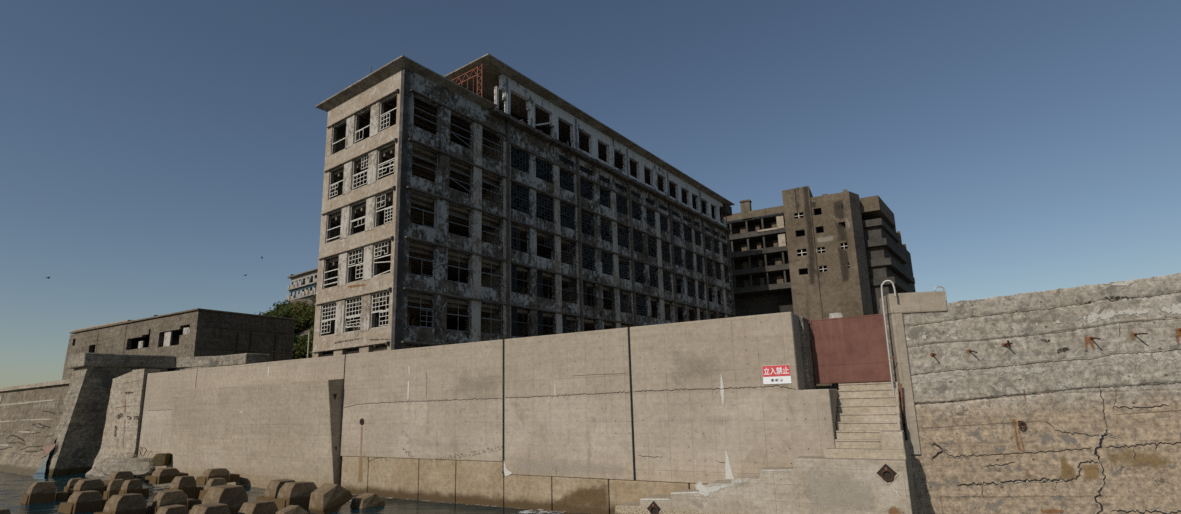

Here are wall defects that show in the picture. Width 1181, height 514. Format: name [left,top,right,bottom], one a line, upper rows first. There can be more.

damp [560,485,607,505]
crack [907,291,1181,514]